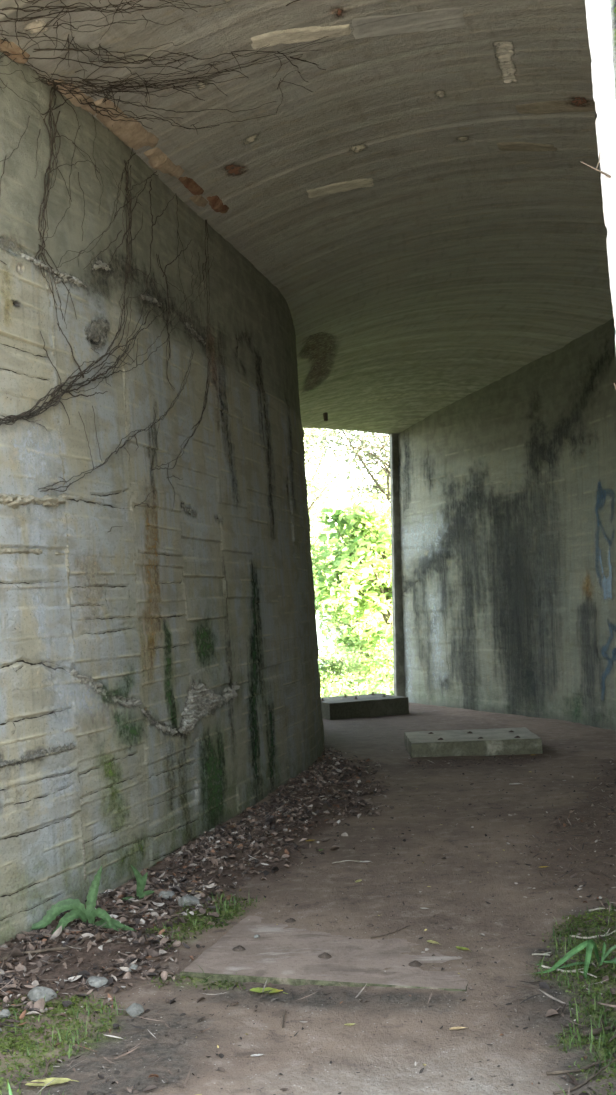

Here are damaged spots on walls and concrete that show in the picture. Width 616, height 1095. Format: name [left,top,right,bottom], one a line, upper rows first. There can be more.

spalling [494,41,516,83]
damp [398,433,410,508]
damp [400,346,610,718]
crack [1,660,69,673]